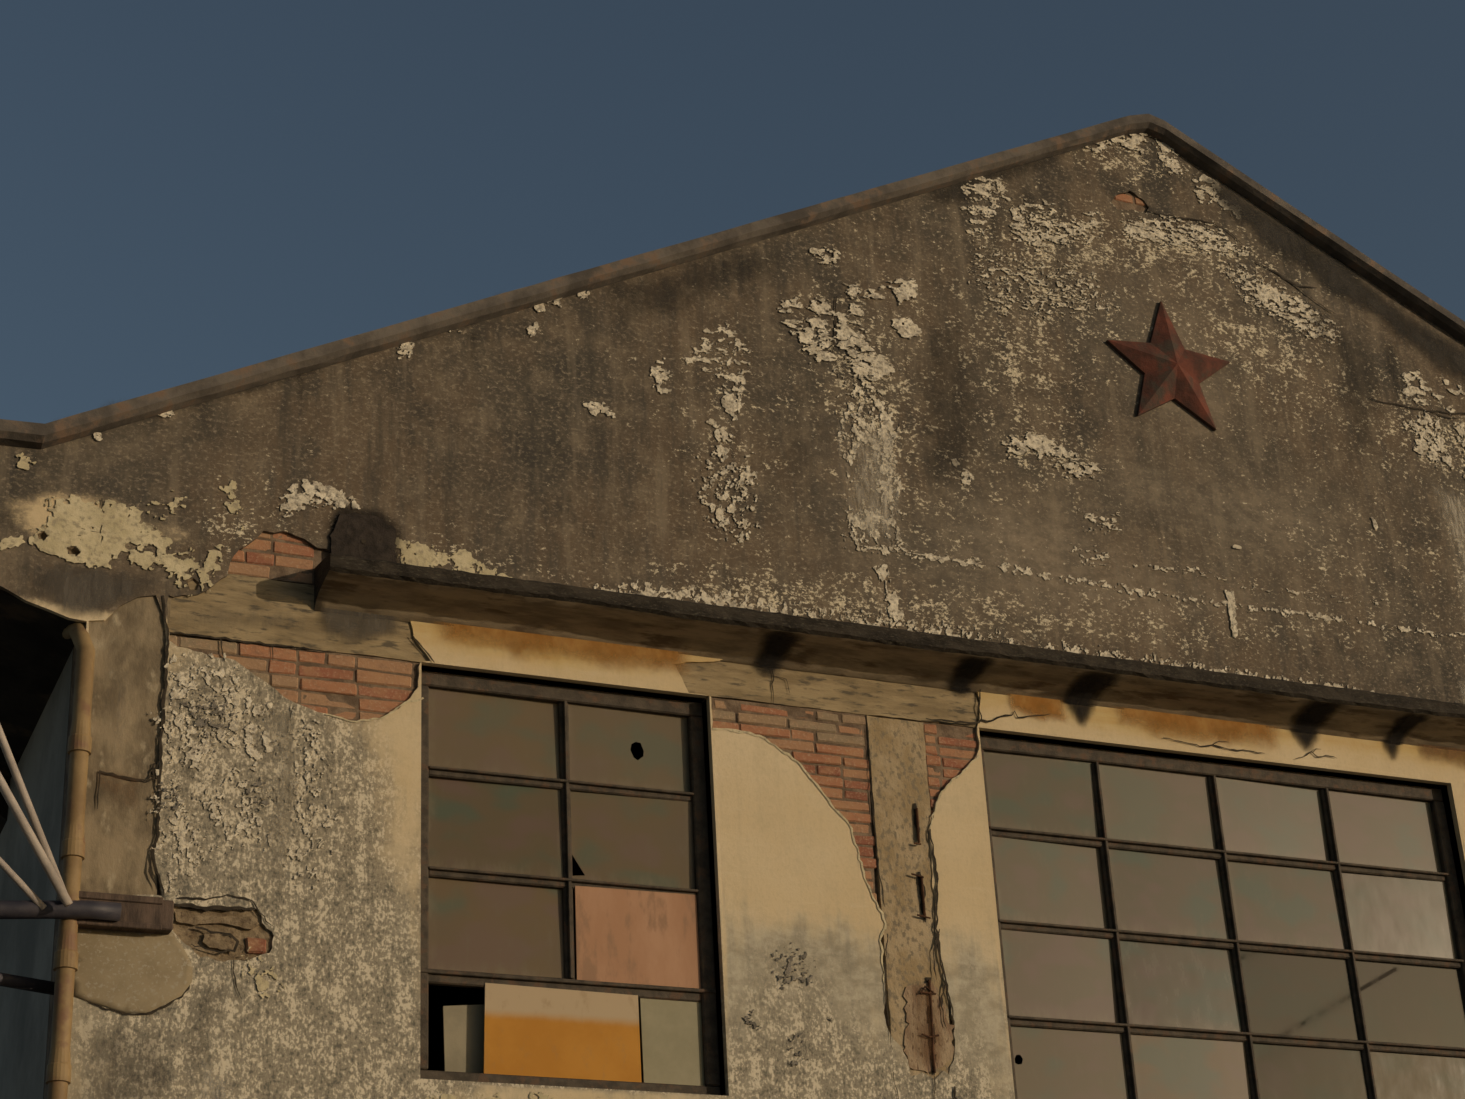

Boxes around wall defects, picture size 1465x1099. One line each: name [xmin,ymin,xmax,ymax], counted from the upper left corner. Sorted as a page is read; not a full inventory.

peeling [961,133,1343,345]
peeling [0,479,361,597]
leakage [329,506,397,563]
peeling [594,278,1374,692]
leakage [758,631,799,675]
leakage [1065,672,1115,723]
crack [1163,737,1261,753]
leakage [1293,702,1341,748]
leakage [1385,714,1427,758]
flaking render [147,635,424,999]
flaking render [711,698,887,990]
crack [867,723,957,1099]